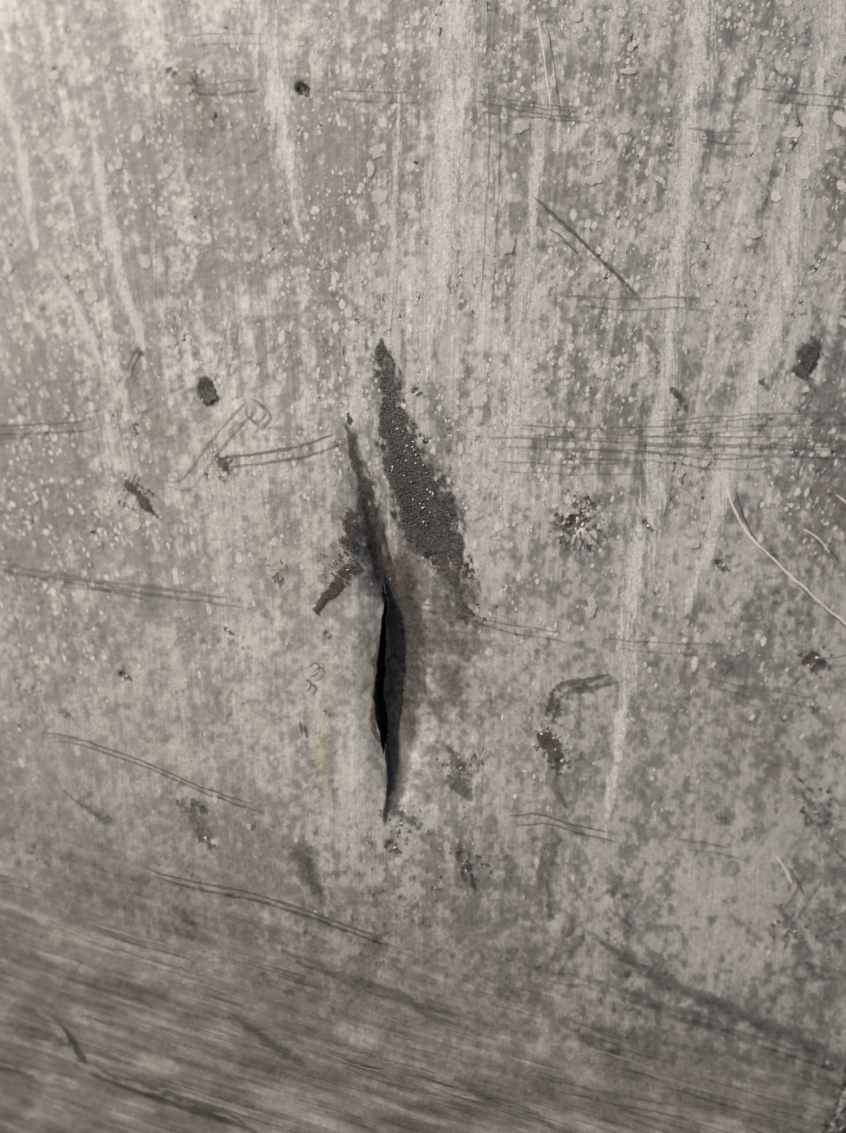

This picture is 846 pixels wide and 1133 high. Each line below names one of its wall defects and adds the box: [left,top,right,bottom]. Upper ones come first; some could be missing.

damp [372,91,478,659]
damp [416,0,487,383]
crack [345,411,395,820]
damp [344,424,430,745]